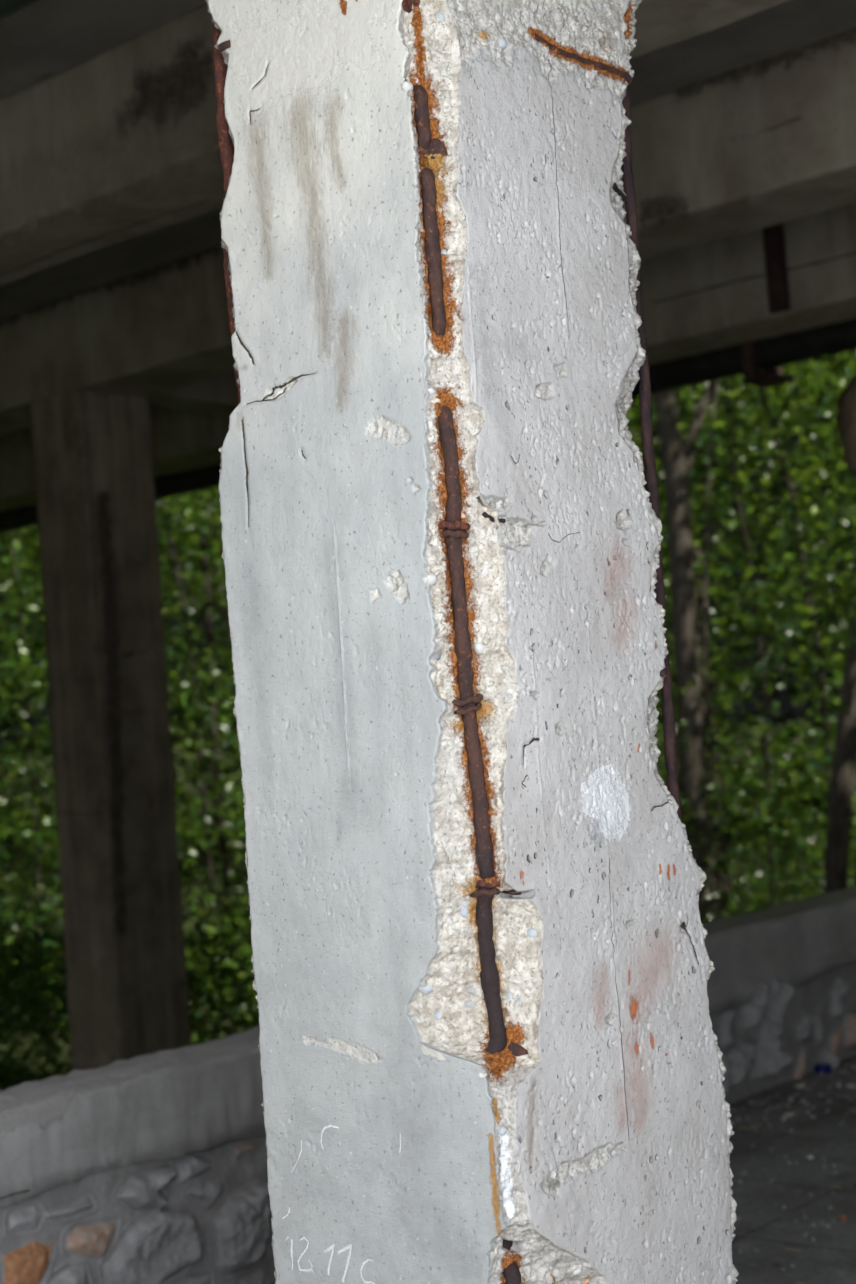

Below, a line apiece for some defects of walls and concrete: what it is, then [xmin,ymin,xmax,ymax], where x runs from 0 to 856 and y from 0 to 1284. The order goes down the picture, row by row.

corrosion [528,26,630,85]
corrosion [402,0,464,358]
crack [236,331,315,527]
corrosion [433,382,503,988]
spalling [206,0,739,1284]
corrosion [478,1005,529,1082]
corrosion [489,1098,502,1234]
corrosion [501,1249,525,1284]